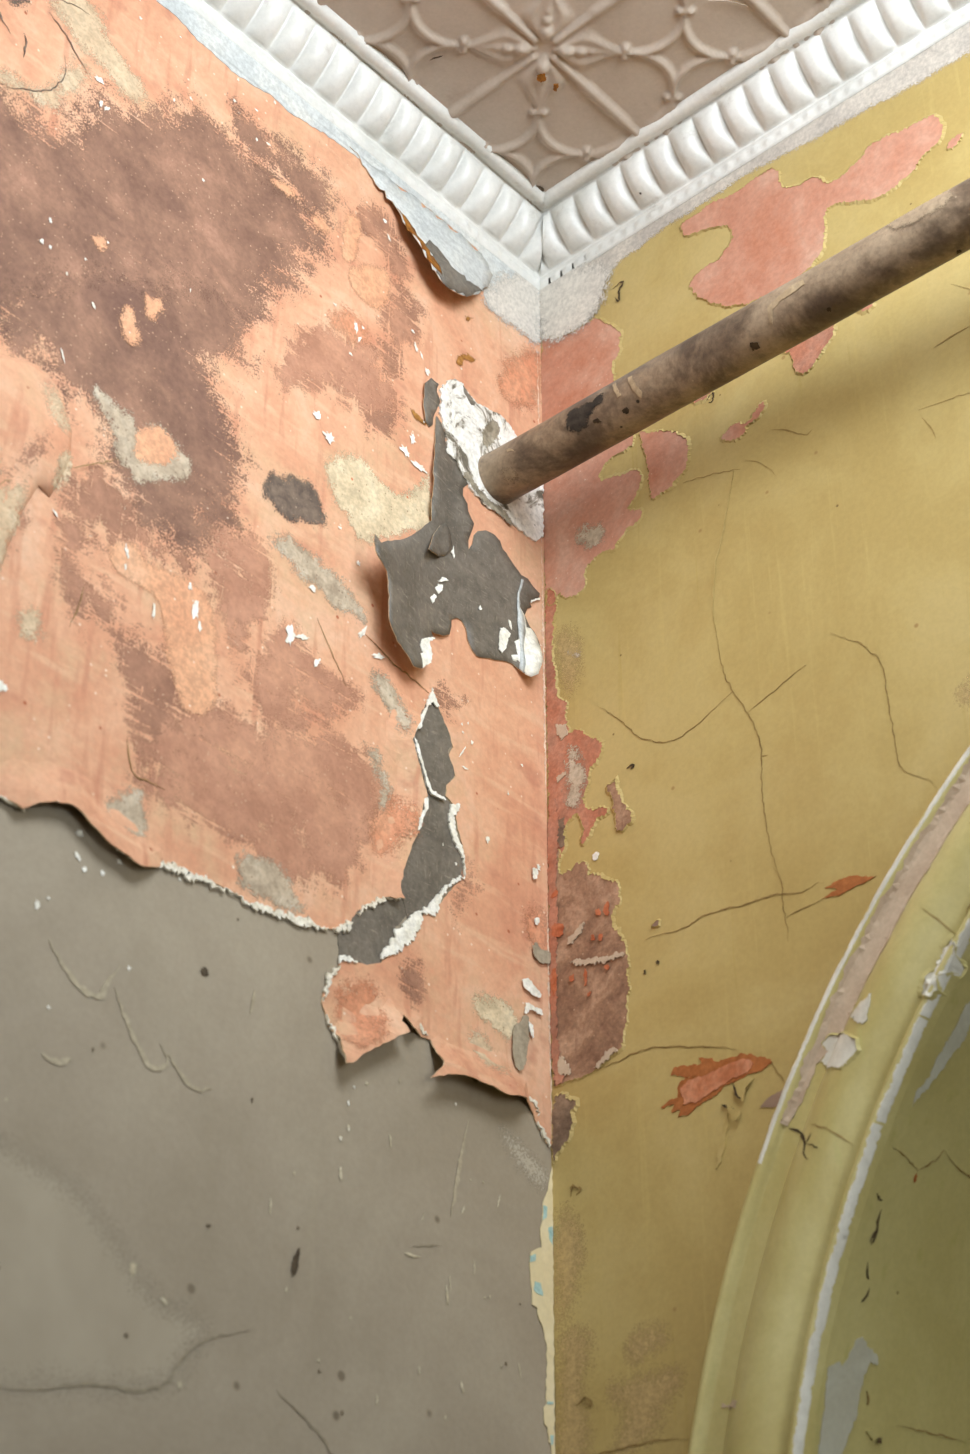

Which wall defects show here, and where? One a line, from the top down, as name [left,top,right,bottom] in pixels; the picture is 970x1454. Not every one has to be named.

peeling [782,307,838,376]
peeling [679,113,964,309]
peeling [856,300,879,316]
damp [0,71,428,903]
peeling [0,0,693,1454]
crack [601,635,821,940]
crack [832,633,937,788]
peeling [660,747,970,1164]
peeling [792,919,970,1454]
crack [894,1148,970,1178]
crack [276,1390,331,1454]
crack [896,1425,965,1443]